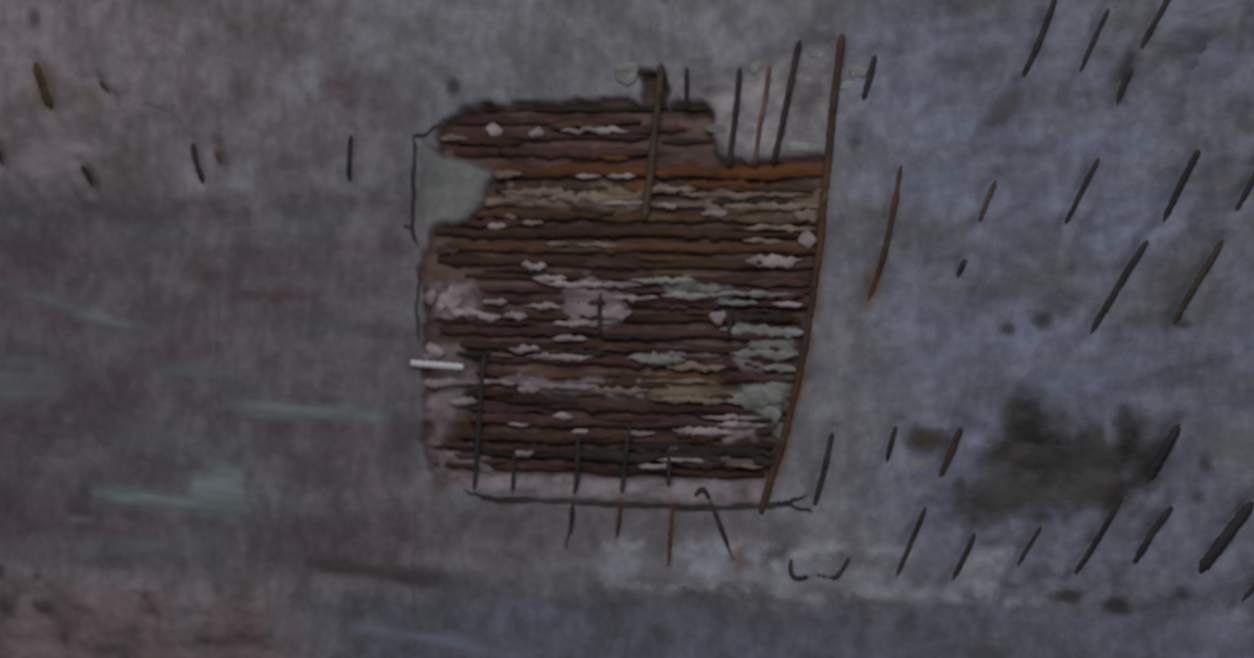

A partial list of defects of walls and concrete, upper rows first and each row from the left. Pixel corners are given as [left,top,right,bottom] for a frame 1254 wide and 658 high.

spalling [419,34,868,566]
leakage [965,399,1156,520]